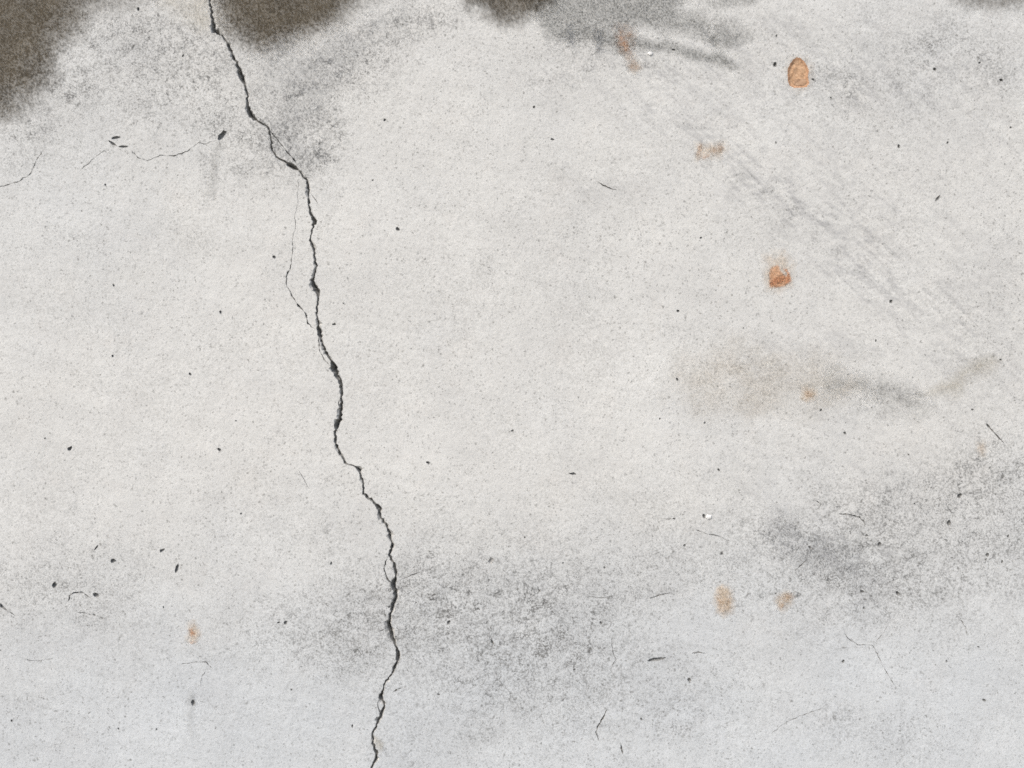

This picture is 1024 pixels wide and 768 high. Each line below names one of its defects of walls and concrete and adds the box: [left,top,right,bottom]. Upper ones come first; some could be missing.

leakage [0,0,99,117]
leakage [215,0,353,49]
leakage [466,0,738,65]
corrosion [770,266,790,287]
crack [208,0,421,768]